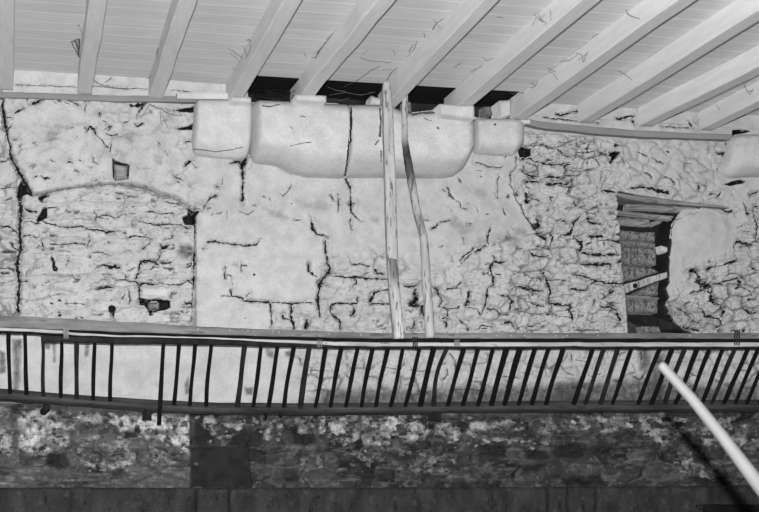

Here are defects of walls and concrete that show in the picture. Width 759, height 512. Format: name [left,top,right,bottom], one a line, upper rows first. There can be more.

crack [0,77,331,330]
crack [330,107,360,231]
crack [426,156,538,262]
spalling [140,298,171,316]
peeling [0,410,728,481]
peeling [718,415,759,455]